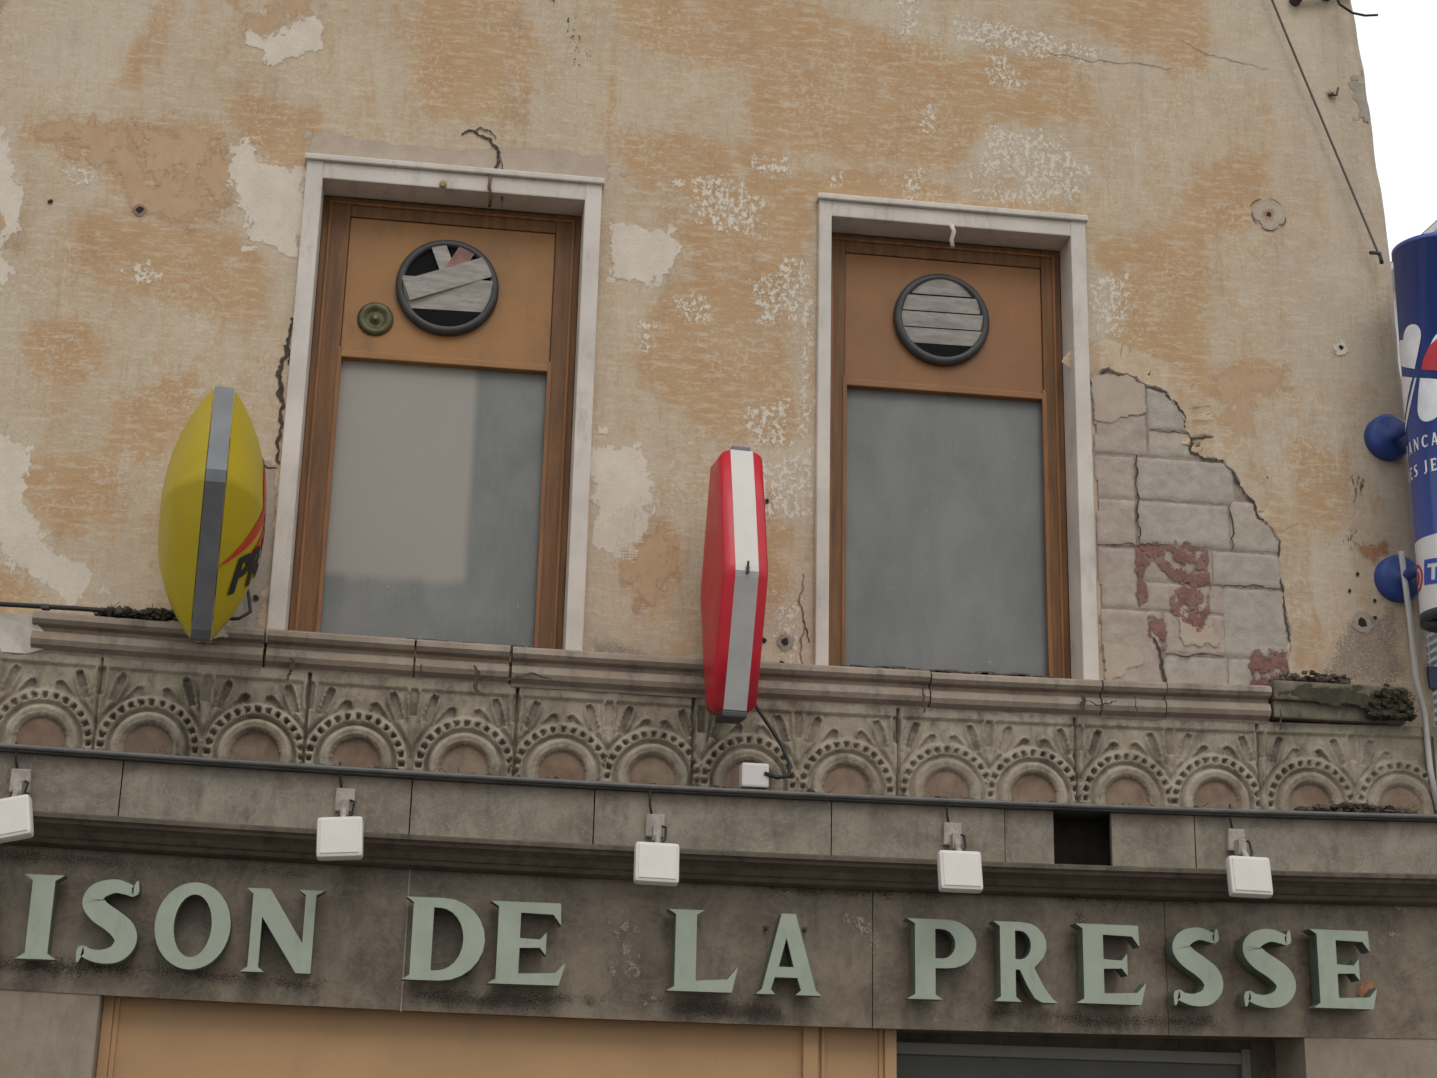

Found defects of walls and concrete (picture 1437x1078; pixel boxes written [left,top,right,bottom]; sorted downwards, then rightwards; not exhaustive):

peeling [244,3,328,68]
peeling [0,125,25,293]
crack [461,127,503,208]
peeling [672,152,797,236]
peeling [605,219,713,326]
crack [265,317,293,469]
flaking render [1062,350,1072,368]
peeling [0,431,116,606]
flaking render [1087,271,1323,686]
crack [472,665,562,693]
crack [1079,693,1138,718]